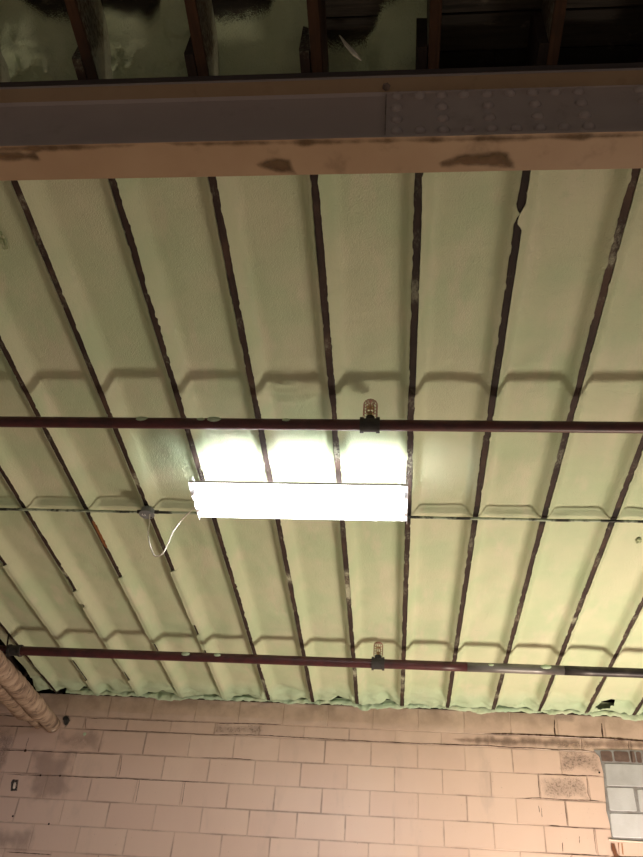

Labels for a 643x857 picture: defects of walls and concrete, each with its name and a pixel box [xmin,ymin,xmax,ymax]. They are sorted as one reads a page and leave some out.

water stain [475,739,643,747]